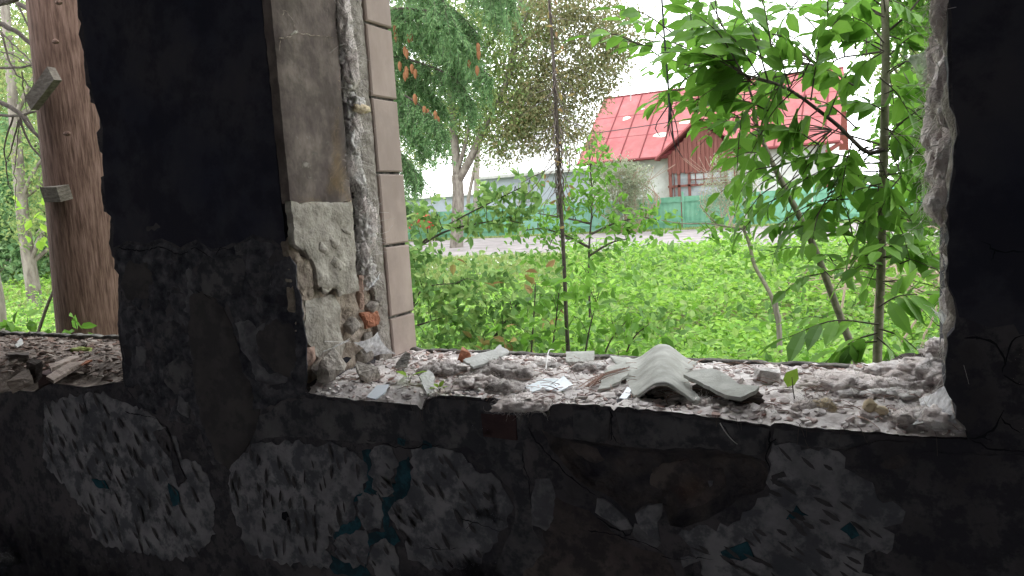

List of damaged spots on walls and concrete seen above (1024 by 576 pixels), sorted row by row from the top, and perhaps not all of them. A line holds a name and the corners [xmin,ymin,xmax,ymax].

flaking render [80,0,384,465]
peeling [329,457,411,576]